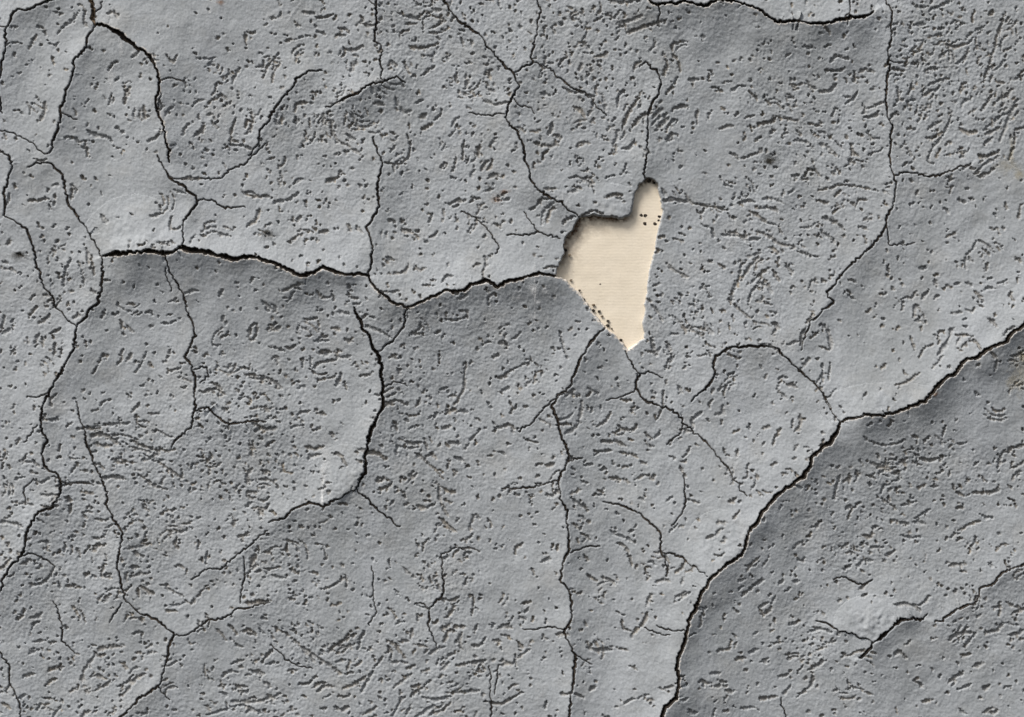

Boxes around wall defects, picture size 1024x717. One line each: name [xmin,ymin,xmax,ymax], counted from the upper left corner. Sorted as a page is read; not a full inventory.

crack [0,0,560,717]
crack [443,0,607,217]
crack [502,328,605,717]
spalling [556,179,662,349]
crack [606,0,1024,717]